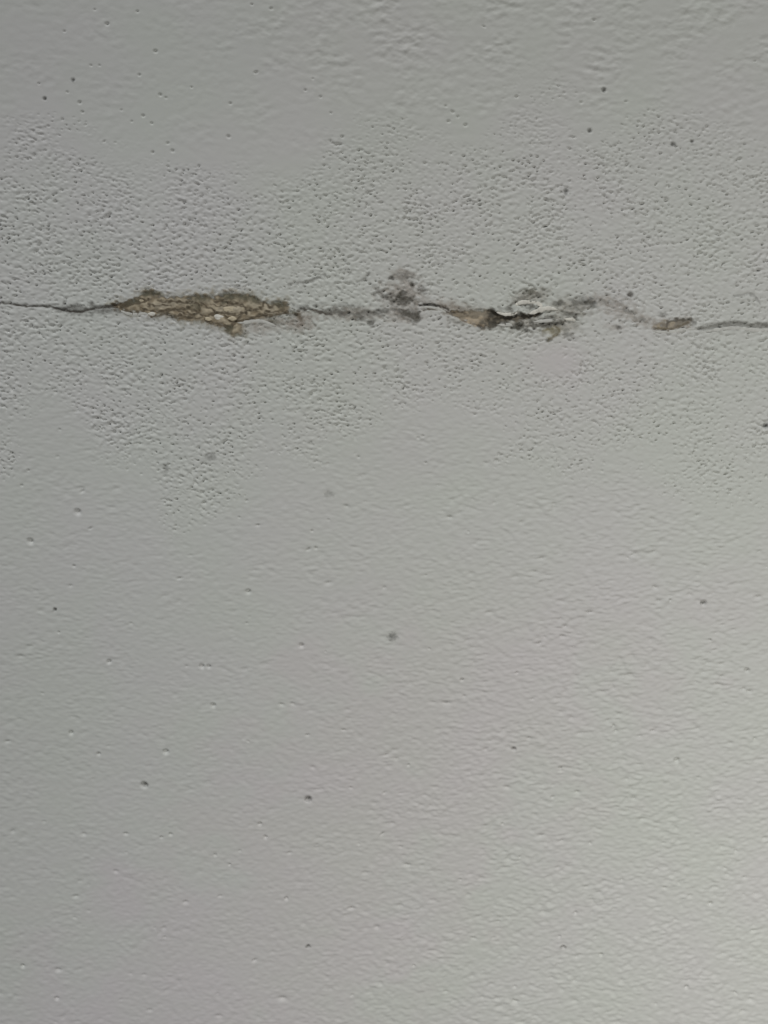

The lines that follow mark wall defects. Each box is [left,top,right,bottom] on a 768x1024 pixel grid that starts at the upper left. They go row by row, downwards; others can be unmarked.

crack [0,302,112,313]
peeling [111,289,289,337]
crack [419,303,465,317]
flaking render [452,294,576,340]
crack [706,323,768,332]